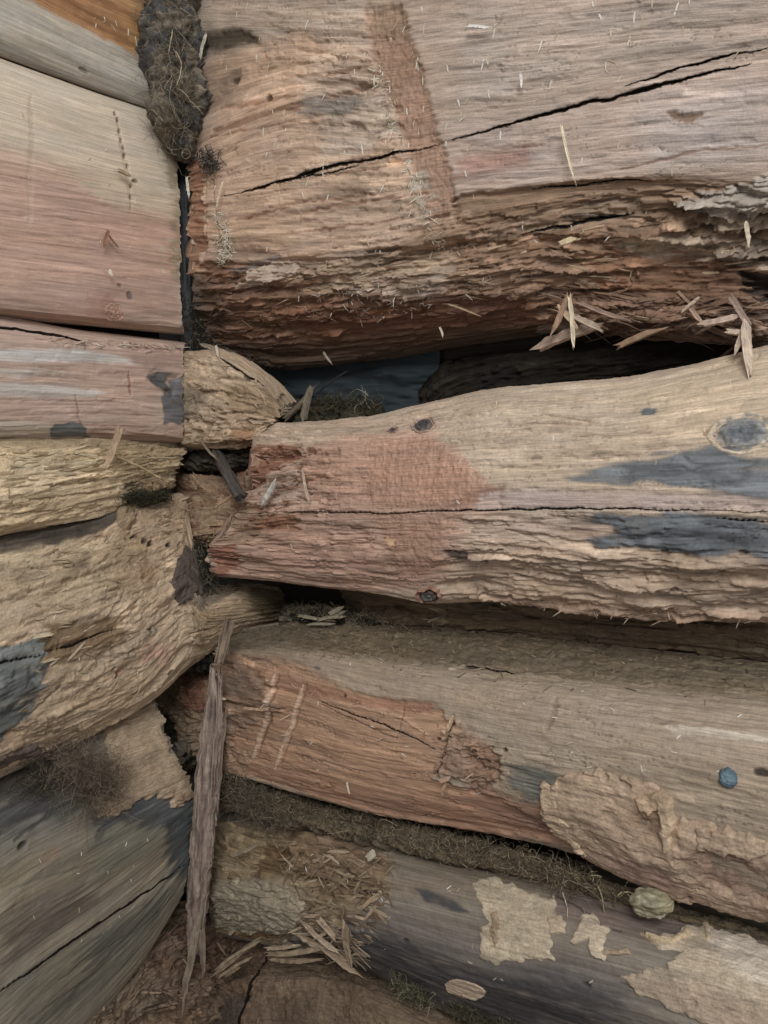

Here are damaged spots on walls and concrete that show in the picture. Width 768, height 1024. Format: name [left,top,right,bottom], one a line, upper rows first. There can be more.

crack [224,47,768,196]
crack [0,326,82,341]
damp [148,372,184,424]
damp [570,446,768,499]
crack [259,507,768,522]
damp [580,512,768,557]
damp [0,618,124,743]
peeling [540,781,587,857]
peeling [695,824,768,863]
crack [0,860,190,992]
peeling [472,876,631,966]
peeling [620,921,768,1024]